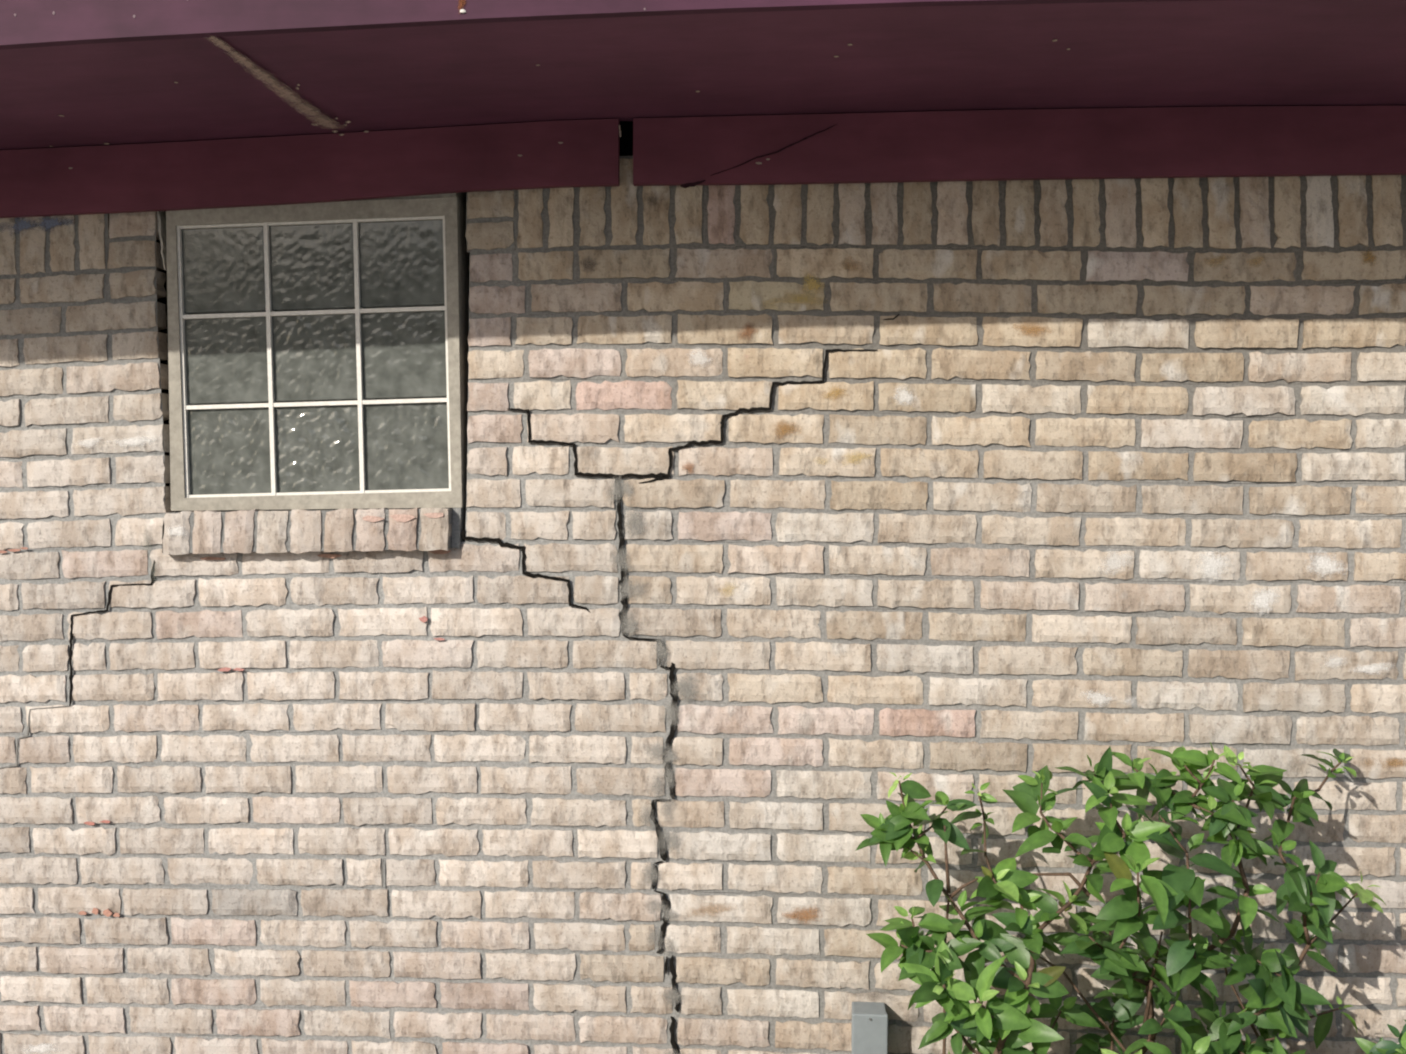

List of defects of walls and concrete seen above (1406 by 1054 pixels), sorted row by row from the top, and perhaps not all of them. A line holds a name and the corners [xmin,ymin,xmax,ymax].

crack [0,519,164,769]
crack [461,314,899,1054]